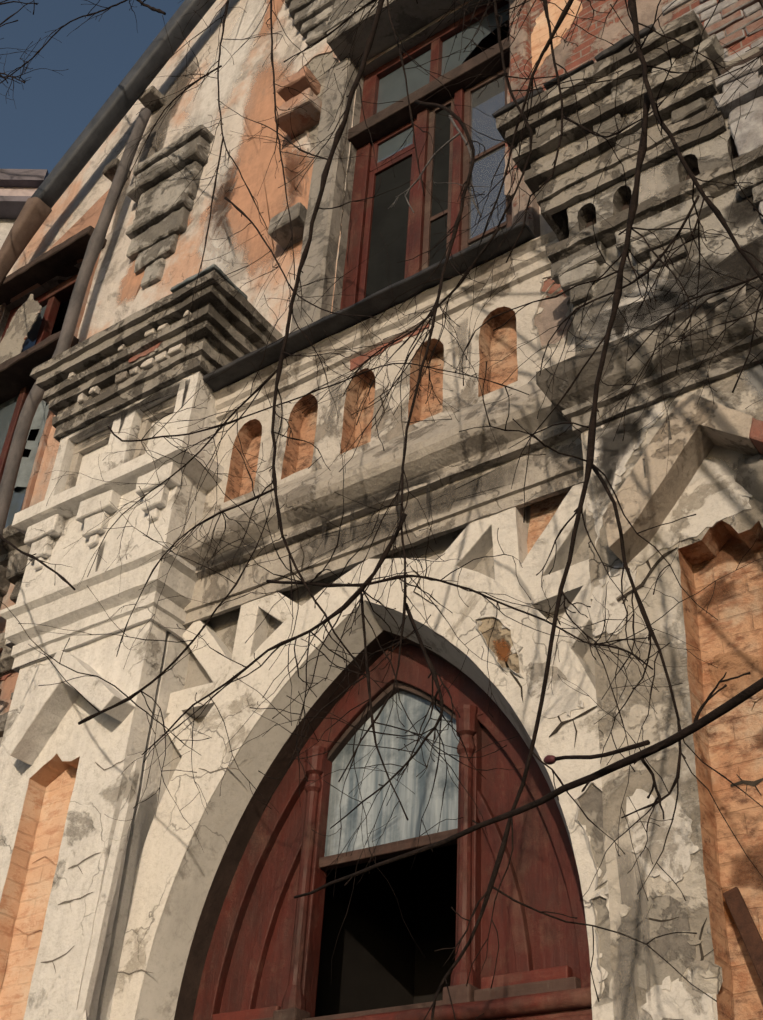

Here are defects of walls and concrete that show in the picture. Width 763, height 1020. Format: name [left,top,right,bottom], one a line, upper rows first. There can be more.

peeling [186,0,284,130]
spalling [300,51,340,101]
spalling [531,0,583,72]
peeling [178,66,319,271]
peeling [120,260,145,301]
peeling [586,397,671,547]
peeling [588,460,753,637]
peeling [475,615,585,719]
crack [32,852,101,907]
peeling [574,782,702,1020]
crack [40,946,74,972]
crack [117,968,152,976]